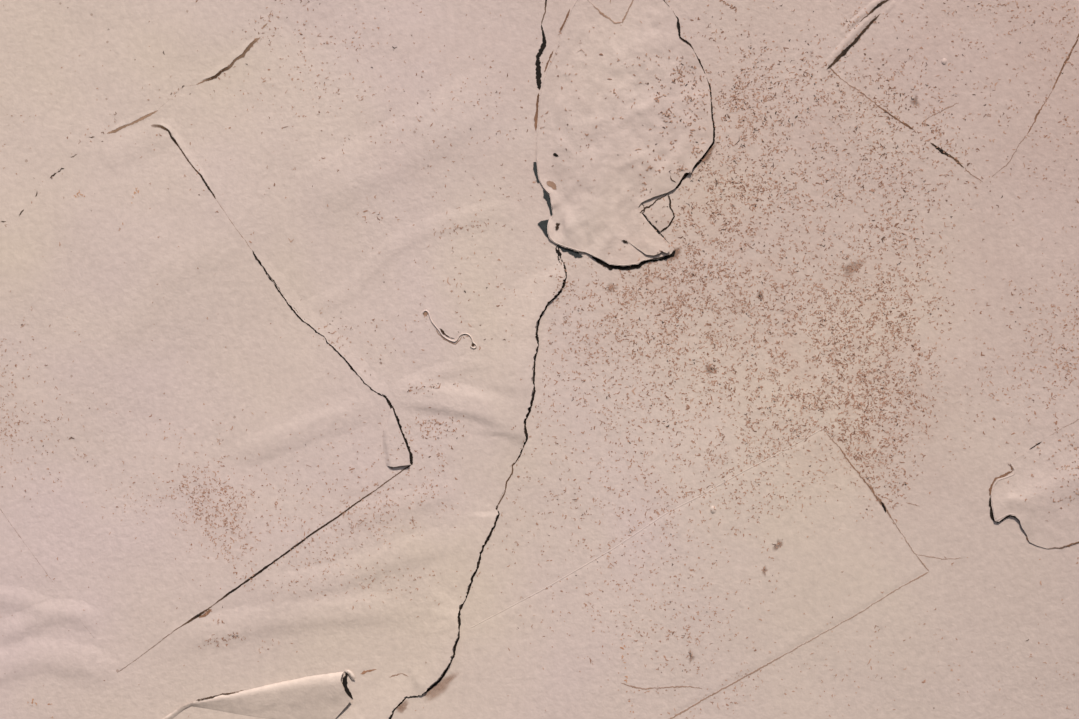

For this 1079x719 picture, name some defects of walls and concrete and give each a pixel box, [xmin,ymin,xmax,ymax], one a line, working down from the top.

crack [535,0,547,90]
peeling [533,0,715,270]
crack [830,34,1079,181]
crack [1,0,413,671]
crack [336,244,567,719]
peeling [989,419,1079,549]